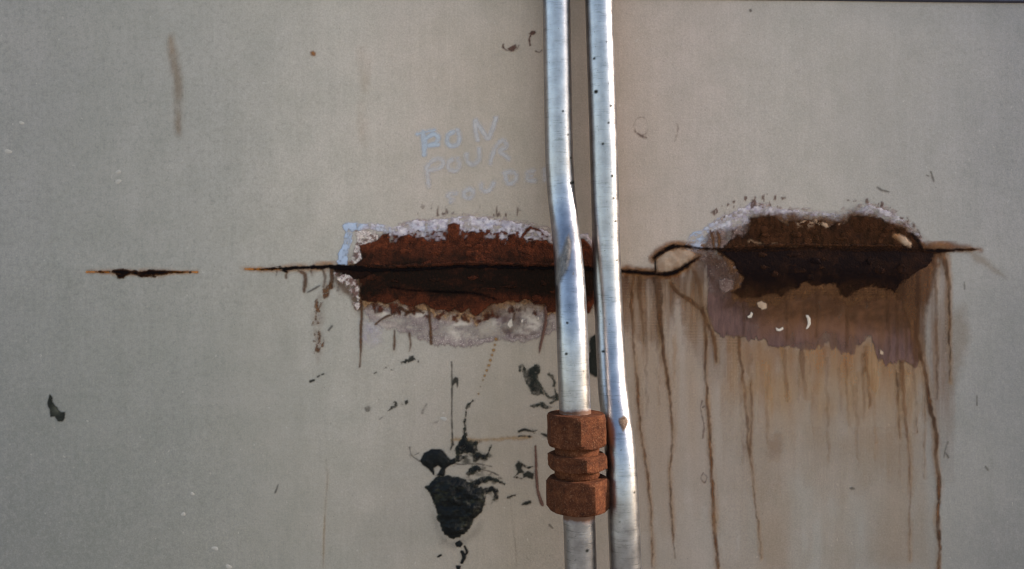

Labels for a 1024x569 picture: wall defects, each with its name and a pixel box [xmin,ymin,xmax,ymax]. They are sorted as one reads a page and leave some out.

crack [86,269,198,279]
crack [245,264,555,352]
corrosion [337,211,556,377]
corrosion [580,234,594,313]
crack [621,234,977,278]
corrosion [622,196,951,569]